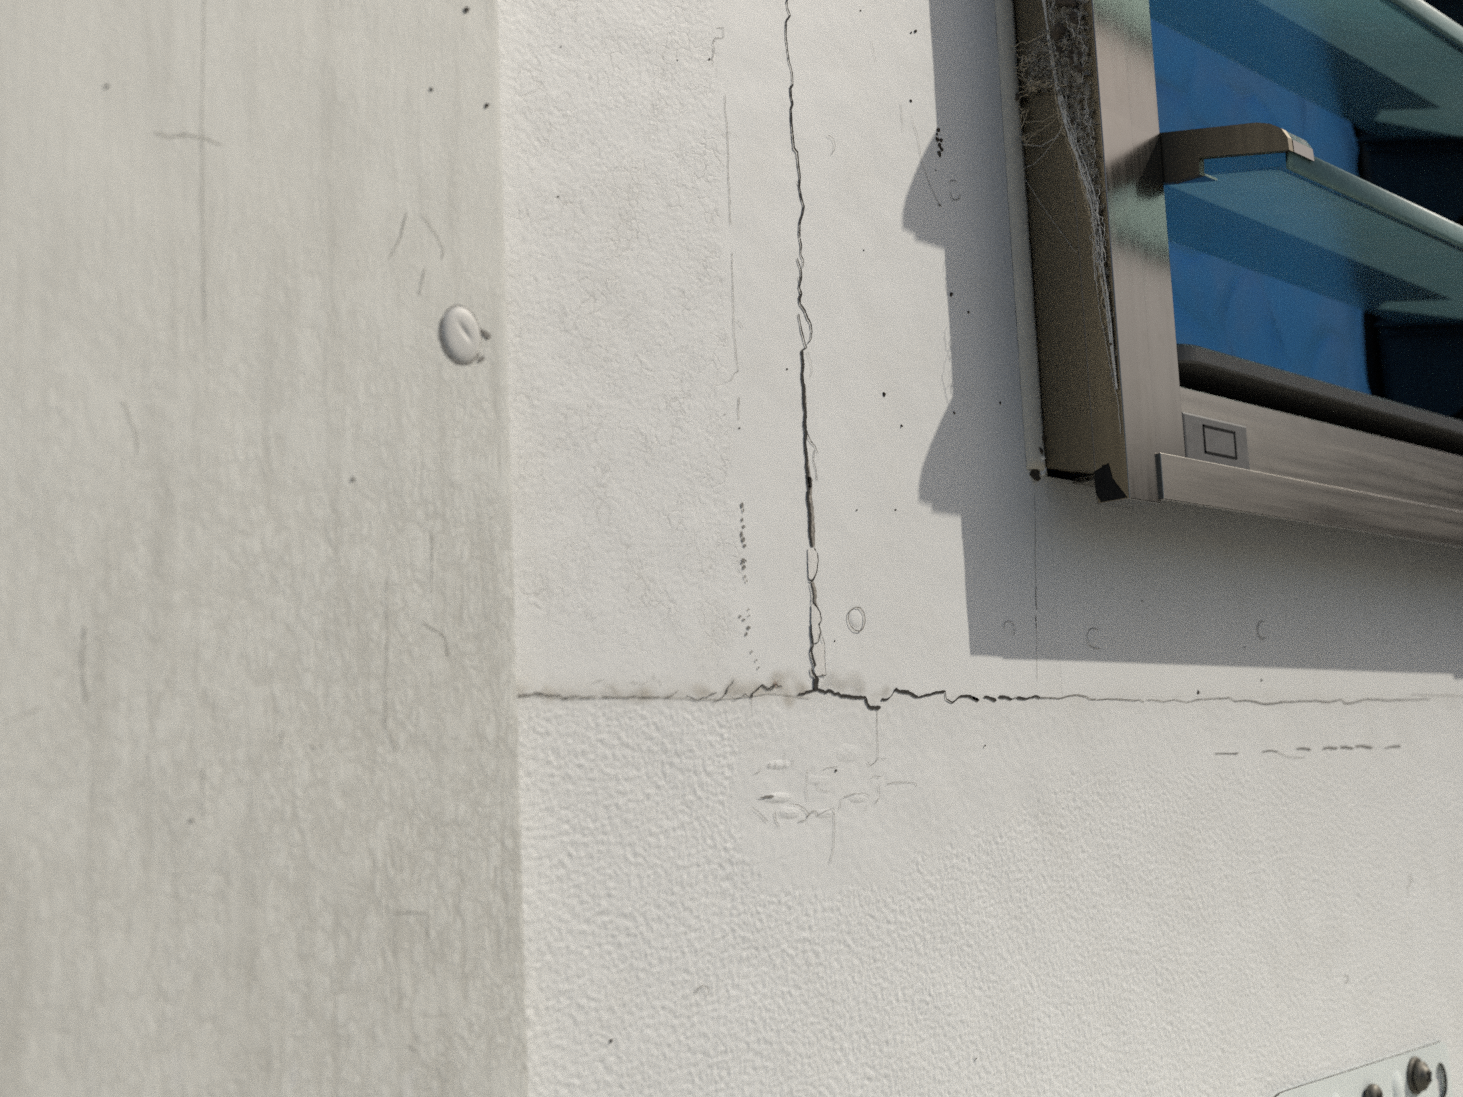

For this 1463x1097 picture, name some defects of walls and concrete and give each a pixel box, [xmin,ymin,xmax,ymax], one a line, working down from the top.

crack [517,0,1463,709]
crack [1214,745,1401,758]